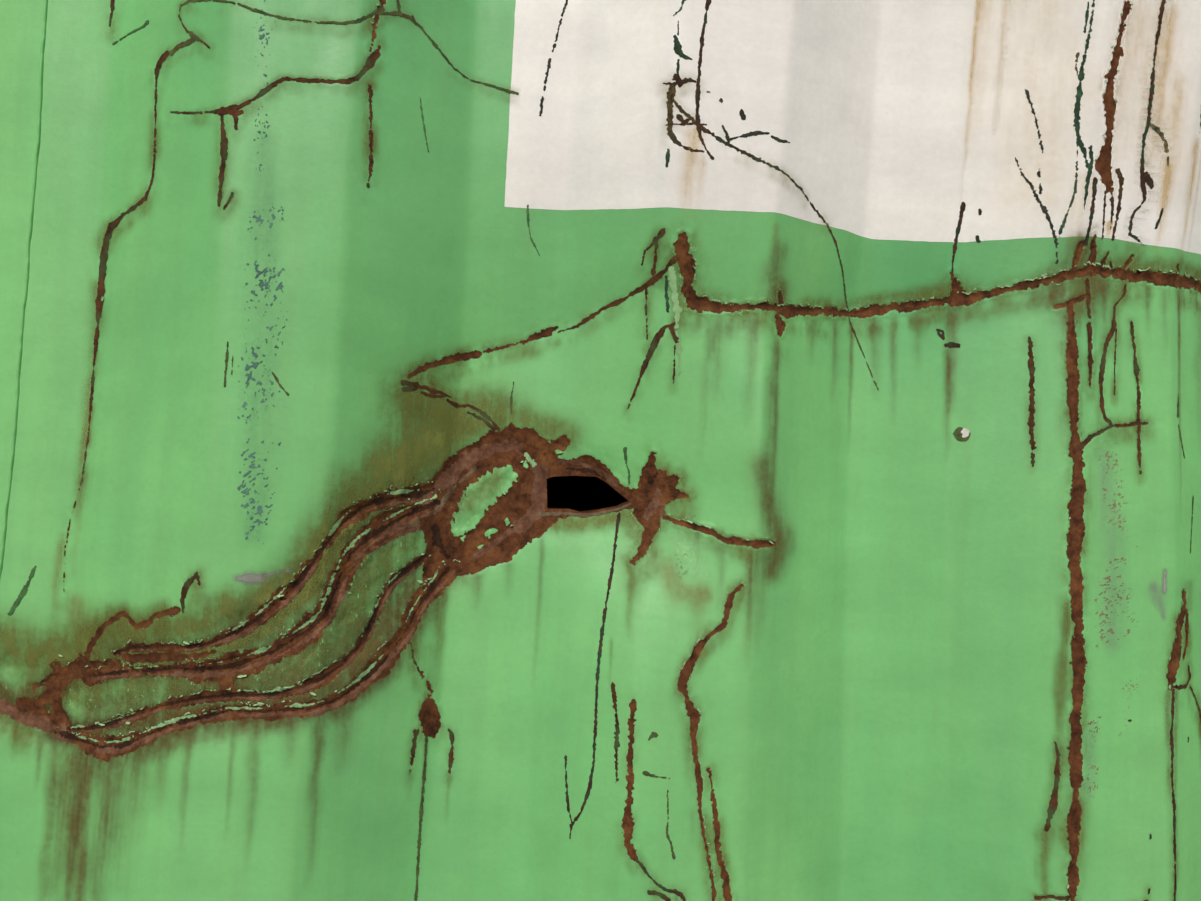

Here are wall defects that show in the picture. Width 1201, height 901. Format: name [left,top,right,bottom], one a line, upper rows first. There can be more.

crack [63,0,568,590]
crack [400,0,1201,474]
corrosion [0,377,574,675]
spalling [0,422,692,762]
crack [623,447,631,485]
crack [564,512,746,901]
crack [662,514,776,553]
crack [1188,496,1196,553]